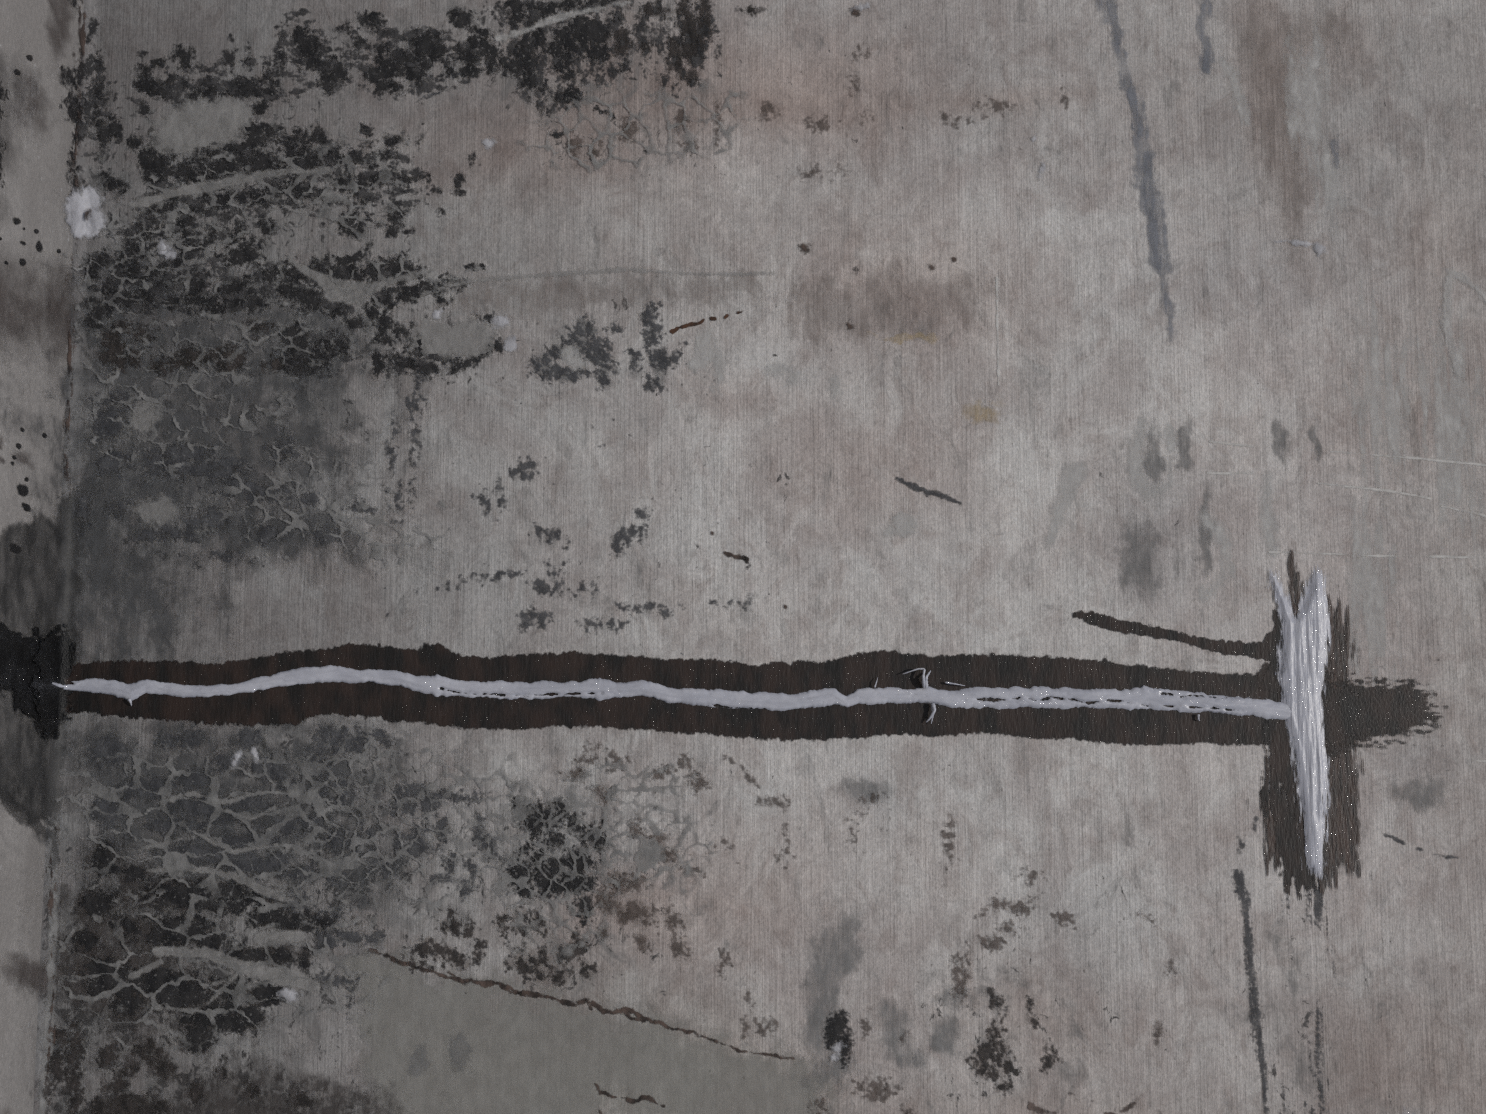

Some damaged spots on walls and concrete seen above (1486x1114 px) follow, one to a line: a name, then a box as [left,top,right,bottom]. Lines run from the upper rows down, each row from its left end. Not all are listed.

leakage [1121,80,1173,332]
crack [52,550,1451,914]
crack [369,948,794,1059]